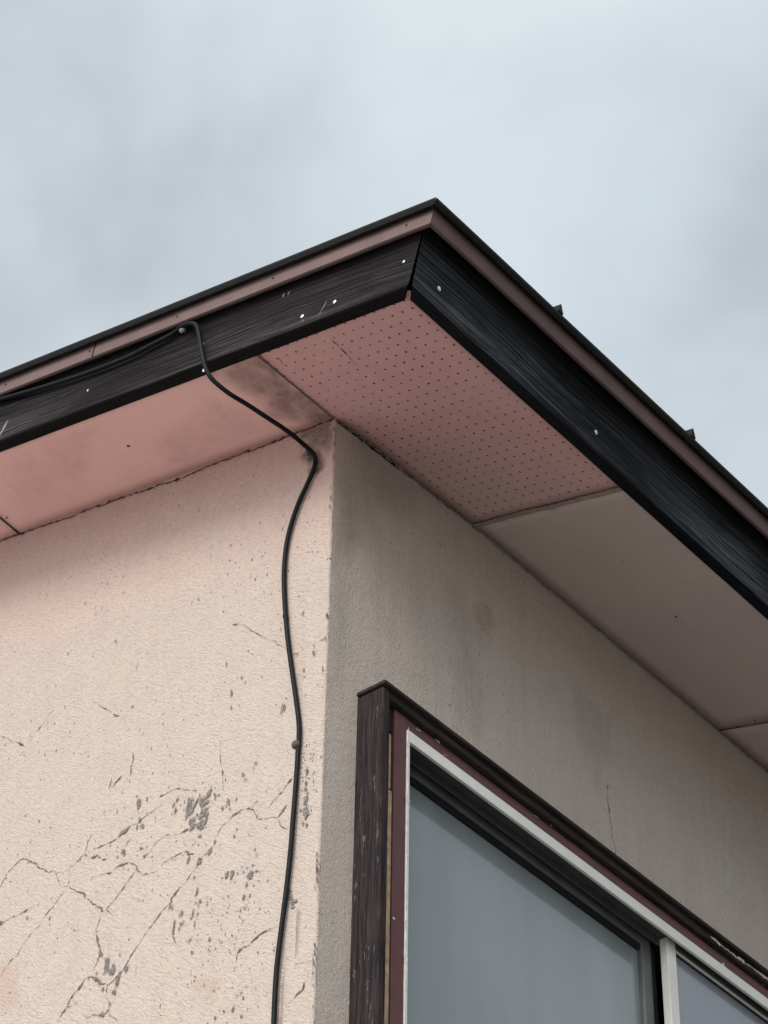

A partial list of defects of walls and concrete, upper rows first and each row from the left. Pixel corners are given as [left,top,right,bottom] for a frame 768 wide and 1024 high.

crack [0,779,292,1024]
peeling [116,782,260,965]